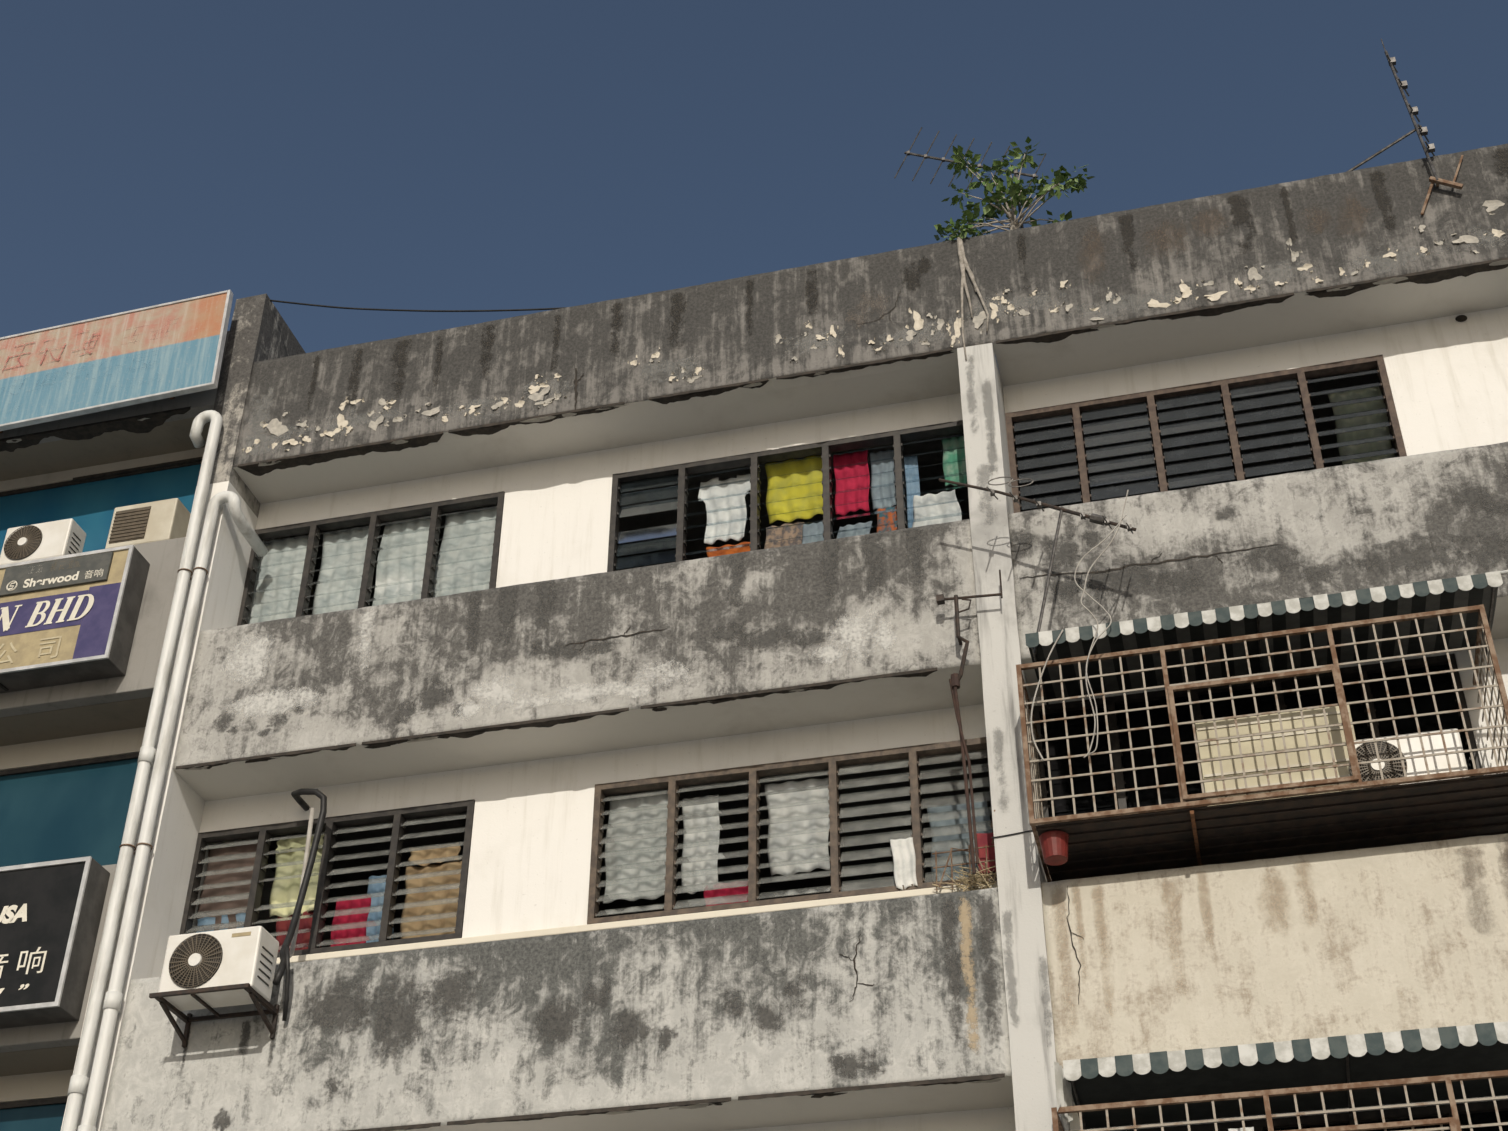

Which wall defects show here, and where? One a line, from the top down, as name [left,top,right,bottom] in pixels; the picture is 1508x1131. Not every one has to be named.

spalling [628,200,1508,404]
damp [466,585,517,649]
damp [713,532,896,663]
damp [214,638,317,737]
damp [395,663,686,723]
mould [305,971,479,1059]
damp [534,981,678,1051]
crack [840,934,874,1002]
damp [942,896,1000,1048]
crack [1066,886,1084,1005]
damp [829,1048,885,1079]
damp [213,1108,230,1131]